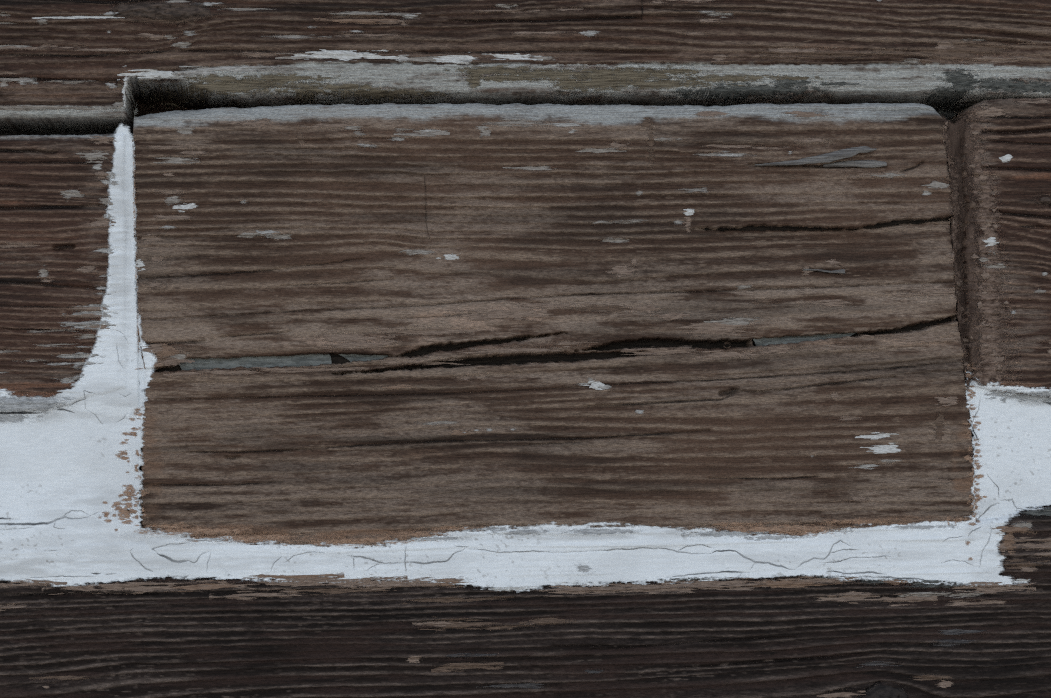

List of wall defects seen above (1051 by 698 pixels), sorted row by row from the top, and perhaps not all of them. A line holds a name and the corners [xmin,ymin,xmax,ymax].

crack [703,216,953,231]
crack [851,318,952,337]
crack [155,342,195,372]
crack [329,337,756,372]
crack [605,365,921,406]
crack [0,516,87,525]
crack [348,546,542,568]
crack [594,544,738,575]